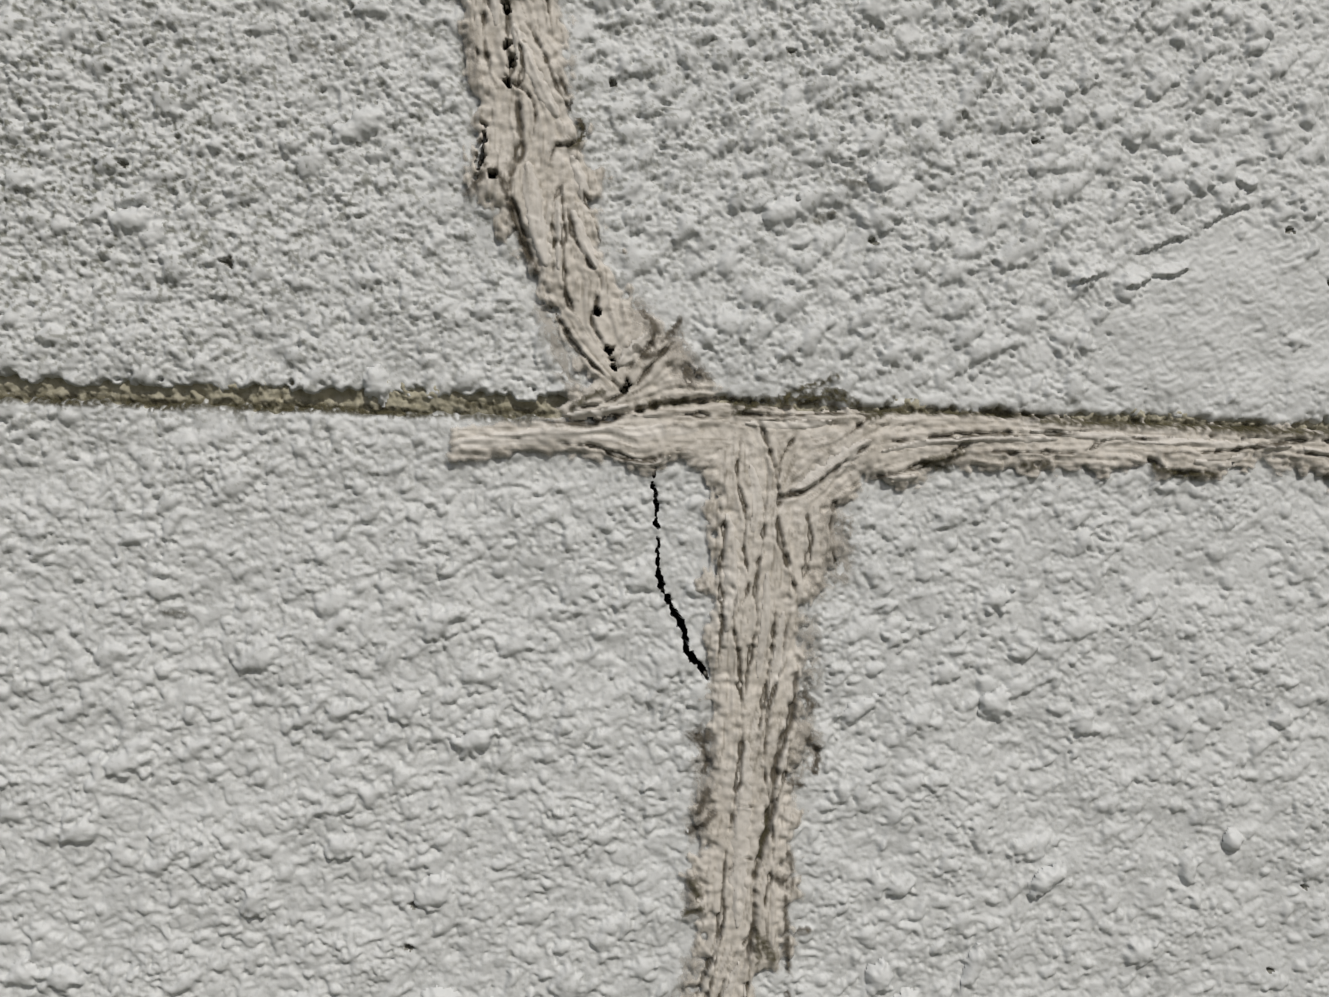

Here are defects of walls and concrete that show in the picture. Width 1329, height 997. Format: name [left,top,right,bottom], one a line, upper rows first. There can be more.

crack [650,467,708,681]